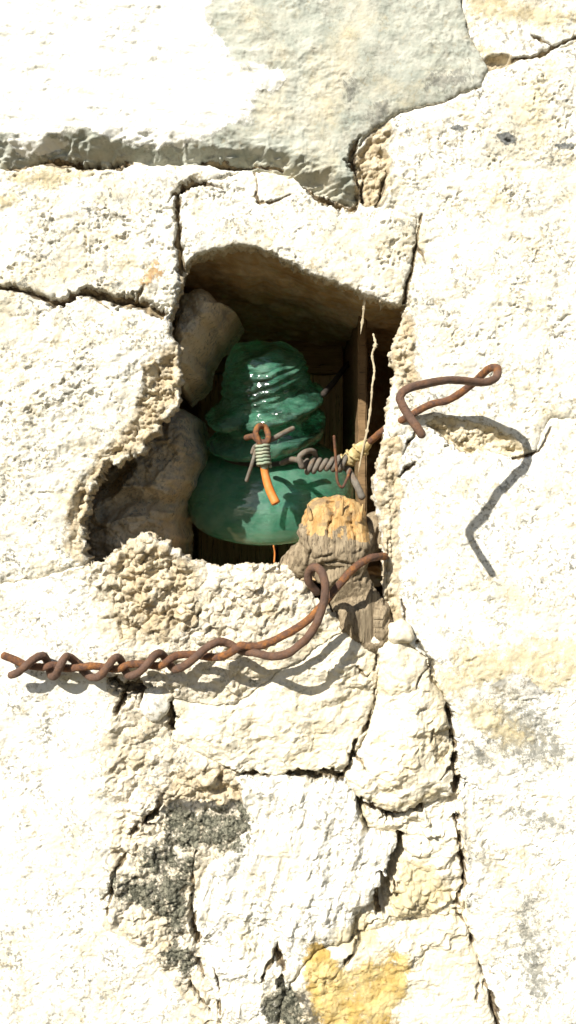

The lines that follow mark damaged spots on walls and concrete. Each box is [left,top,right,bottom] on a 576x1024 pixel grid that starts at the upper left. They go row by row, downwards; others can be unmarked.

crack [0,284,167,320]
spalling [391,315,421,392]
crack [402,214,426,304]
spalling [62,341,183,563]
spalling [427,415,551,460]
spalling [374,433,416,622]
spalling [102,534,199,643]
crack [108,676,147,716]
crack [223,655,378,781]
crack [101,800,162,915]
crack [441,705,500,1024]
crack [260,943,287,983]